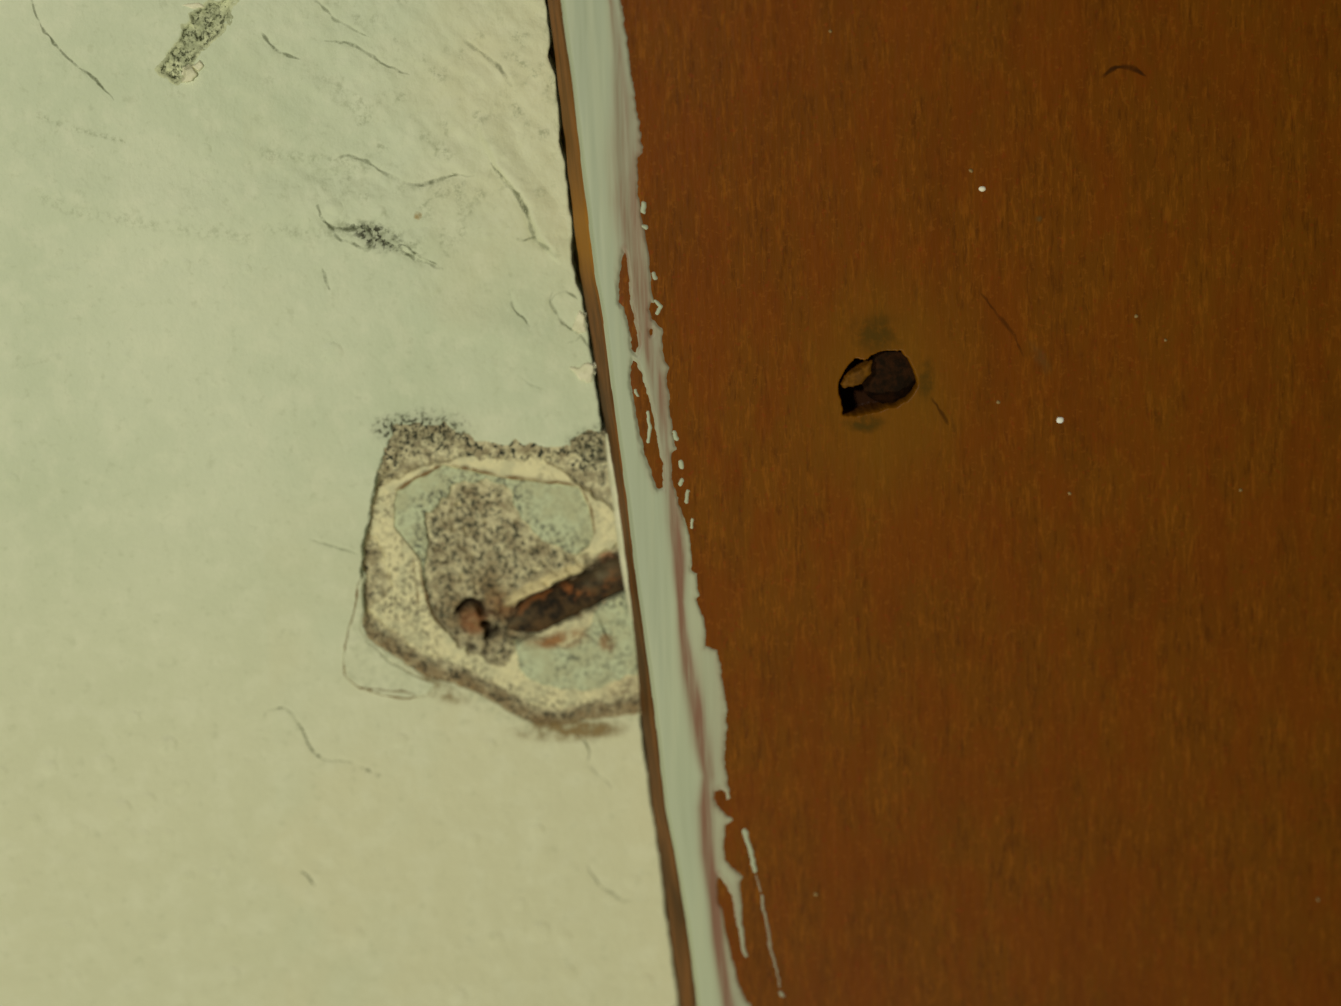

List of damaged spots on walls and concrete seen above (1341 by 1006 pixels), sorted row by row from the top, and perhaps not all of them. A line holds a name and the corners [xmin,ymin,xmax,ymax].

spalling [154,0,239,85]
spalling [342,421,641,727]
corrosion [507,556,625,646]